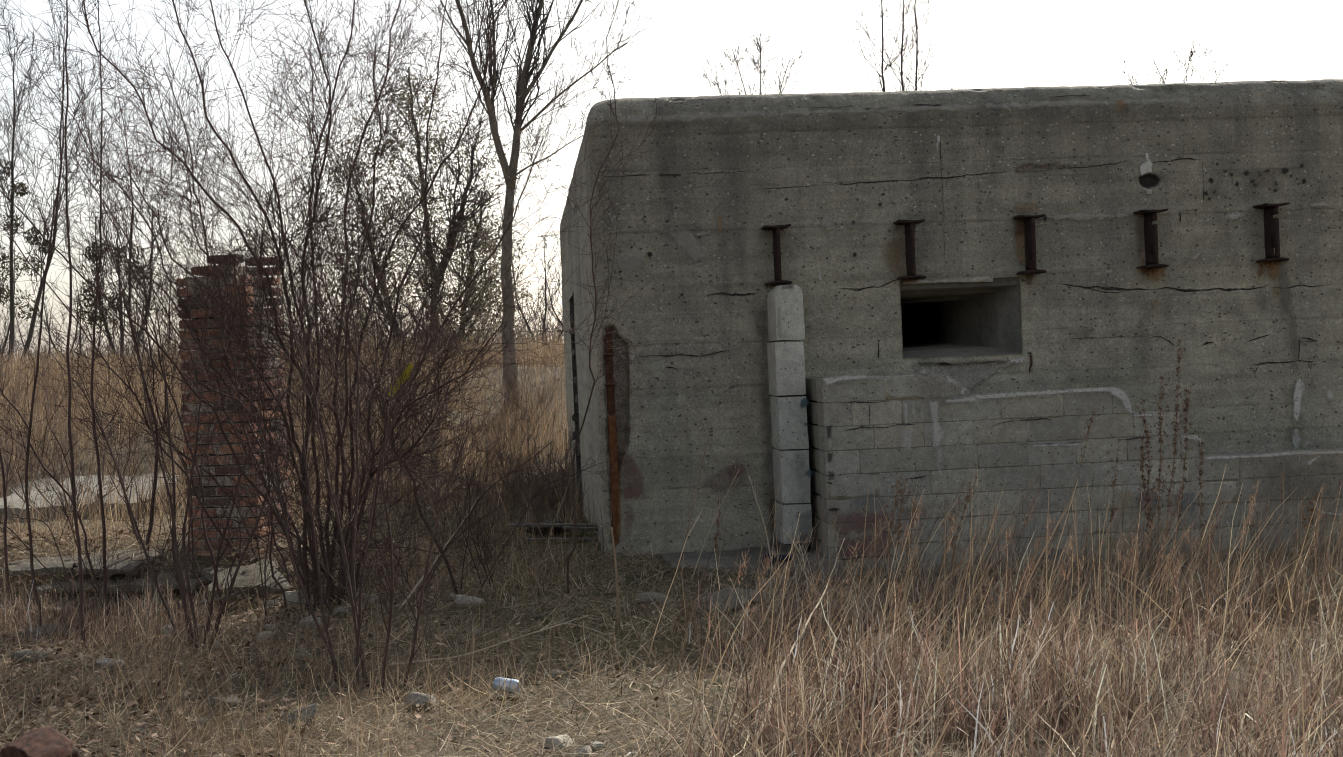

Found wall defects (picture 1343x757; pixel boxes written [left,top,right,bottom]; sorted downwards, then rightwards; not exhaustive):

crack [1055,283,1331,293]
spalling [603,326,643,540]